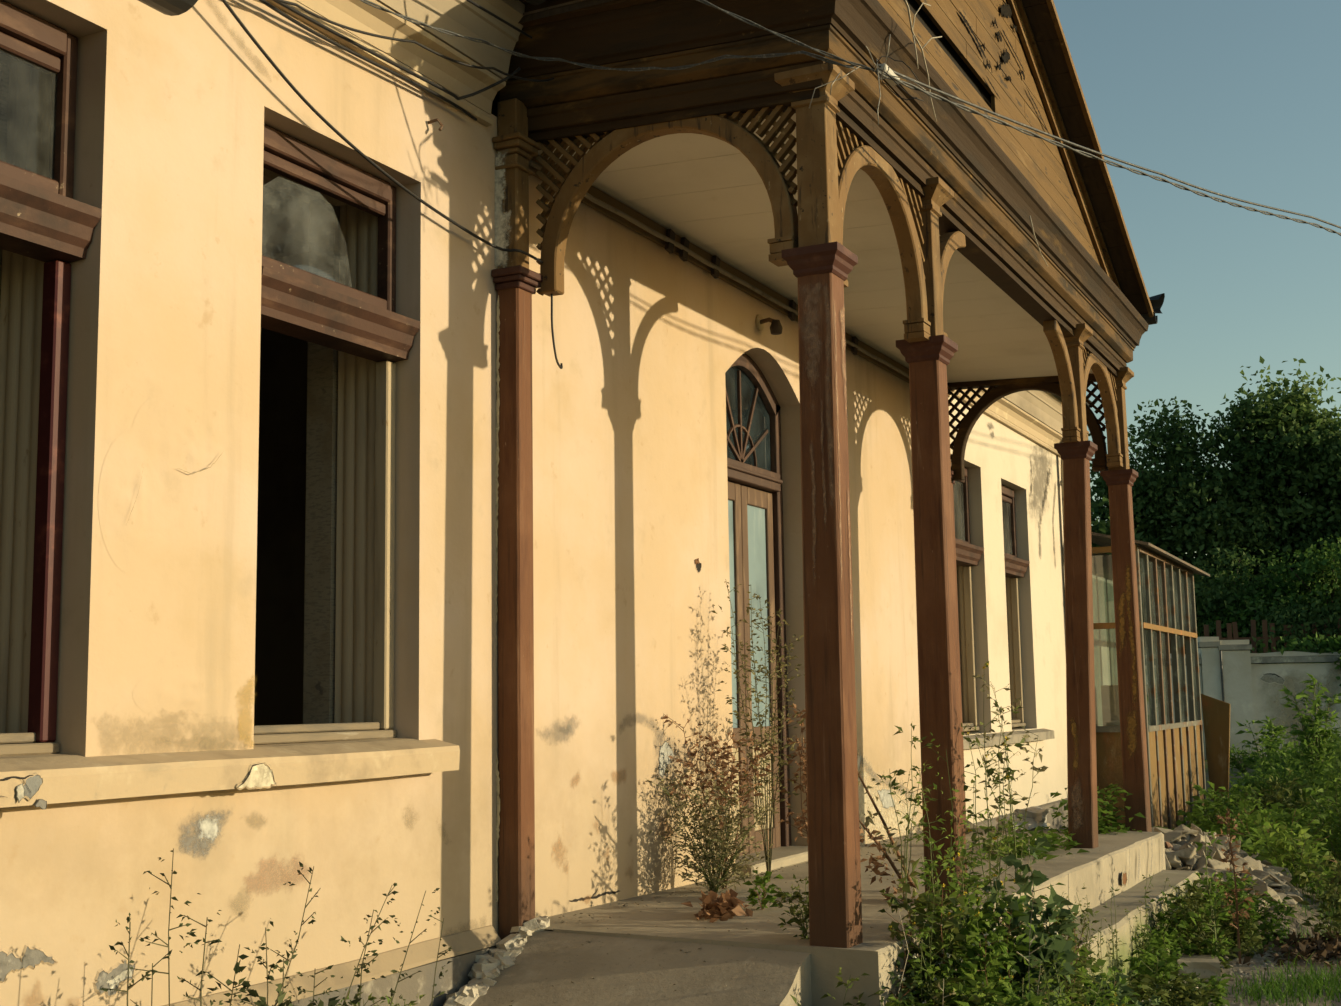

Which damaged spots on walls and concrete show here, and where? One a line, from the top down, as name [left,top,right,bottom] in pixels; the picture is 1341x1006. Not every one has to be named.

peeling [495,154,511,266]
peeling [659,741,674,777]
peeling [16,772,47,809]
peeling [181,814,225,855]
peeling [0,944,58,983]
peeling [93,959,135,998]